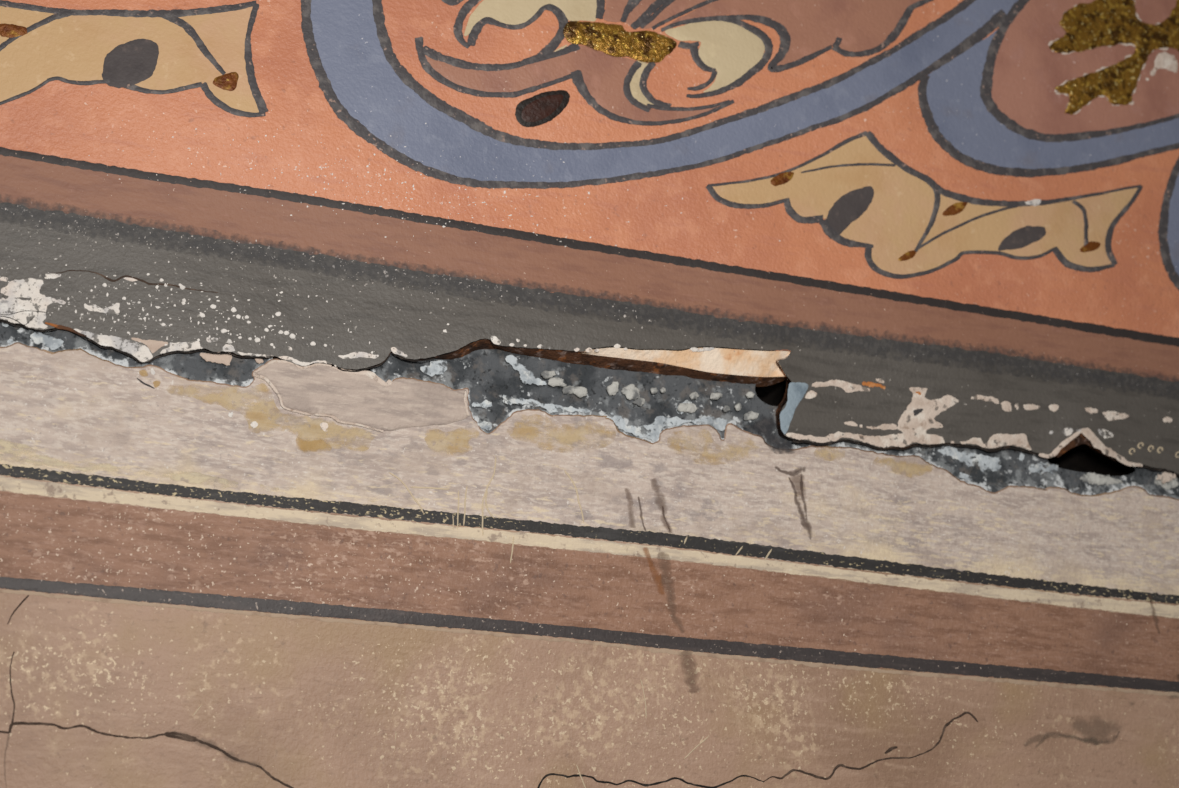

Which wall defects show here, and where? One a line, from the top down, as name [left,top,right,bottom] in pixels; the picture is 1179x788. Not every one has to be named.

peeling [220,129,427,222]
spalling [0,213,1179,499]
leakage [776,467,811,539]
crack [7,595,29,624]
crack [0,652,294,788]
crack [537,712,978,788]